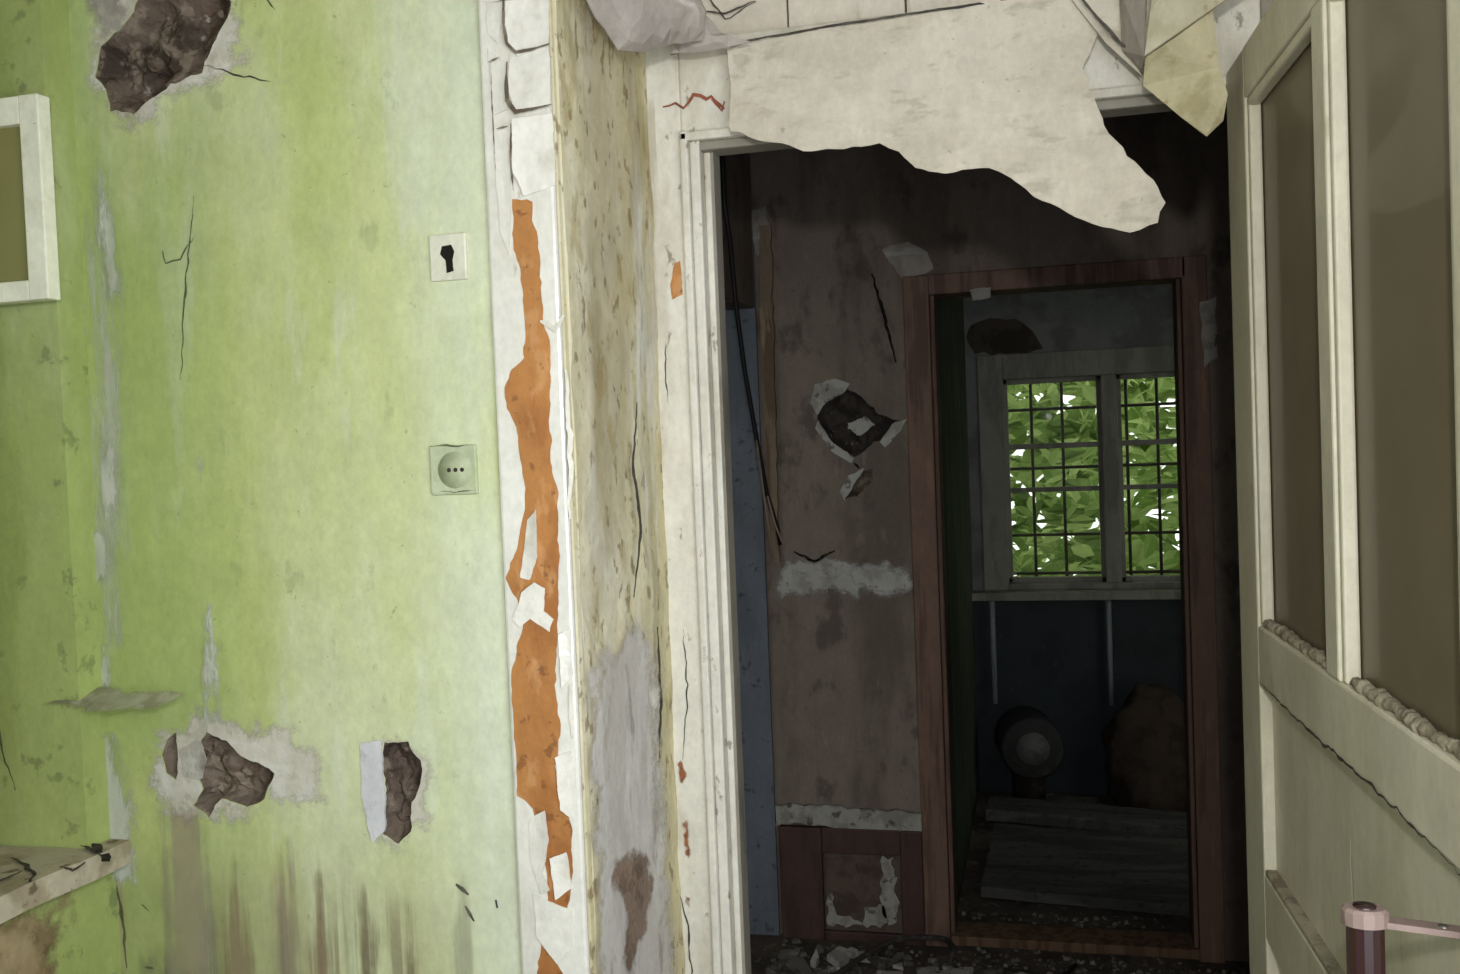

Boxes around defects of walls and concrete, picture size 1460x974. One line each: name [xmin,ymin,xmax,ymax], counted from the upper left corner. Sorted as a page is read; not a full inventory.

flaking render [87,0,250,129]
peeling [586,0,753,54]
peeling [1072,0,1228,137]
peeling [89,181,120,582]
peeling [486,0,689,974]
flaking render [810,379,907,501]
flaking render [150,605,321,824]
peeling [91,734,137,883]
flaking render [360,740,430,848]
peeling [826,855,900,928]